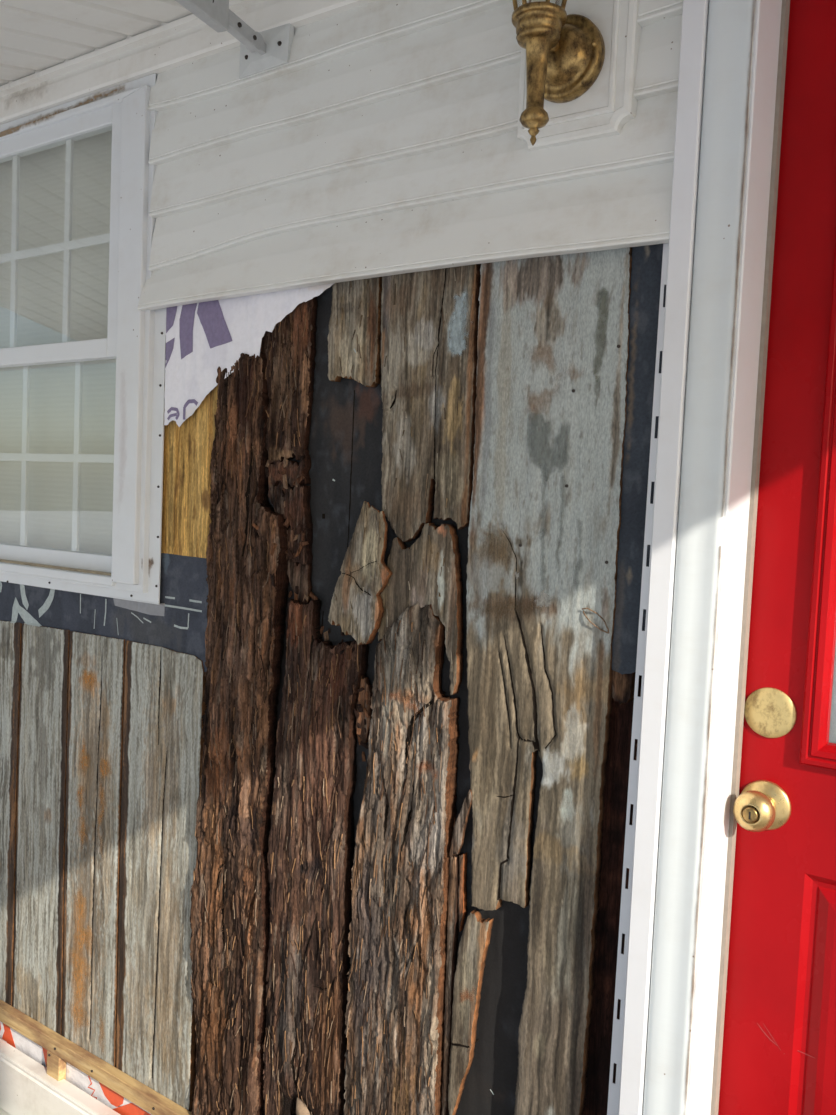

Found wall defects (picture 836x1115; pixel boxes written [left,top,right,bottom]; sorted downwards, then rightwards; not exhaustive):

damp [528,414,568,478]
crack [497,533,556,900]